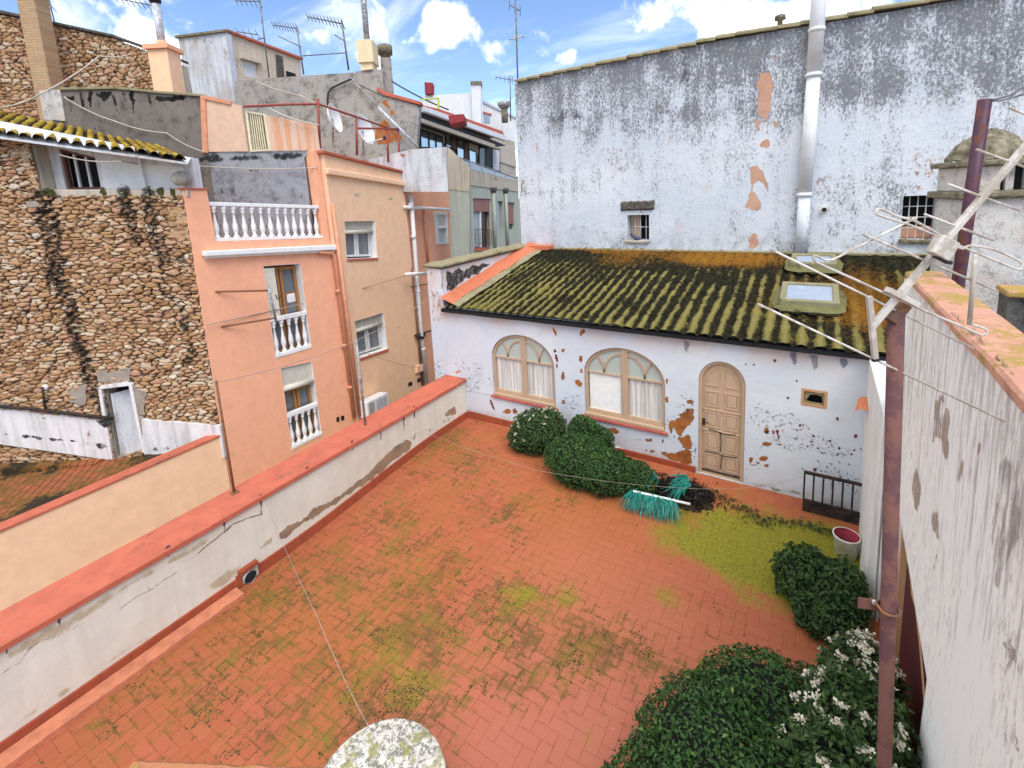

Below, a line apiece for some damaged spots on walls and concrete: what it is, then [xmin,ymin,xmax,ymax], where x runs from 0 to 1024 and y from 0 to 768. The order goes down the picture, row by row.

water stain [67,91,135,115]
peeling [754,72,779,148]
peeling [737,166,768,211]
water stain [99,185,185,270]
peeling [748,233,759,249]
water stain [30,188,115,428]
water stain [431,263,489,291]
spalling [554,349,583,409]
peeling [645,379,694,465]
water stain [932,394,950,458]
water stain [265,440,411,545]
crack [198,513,263,553]